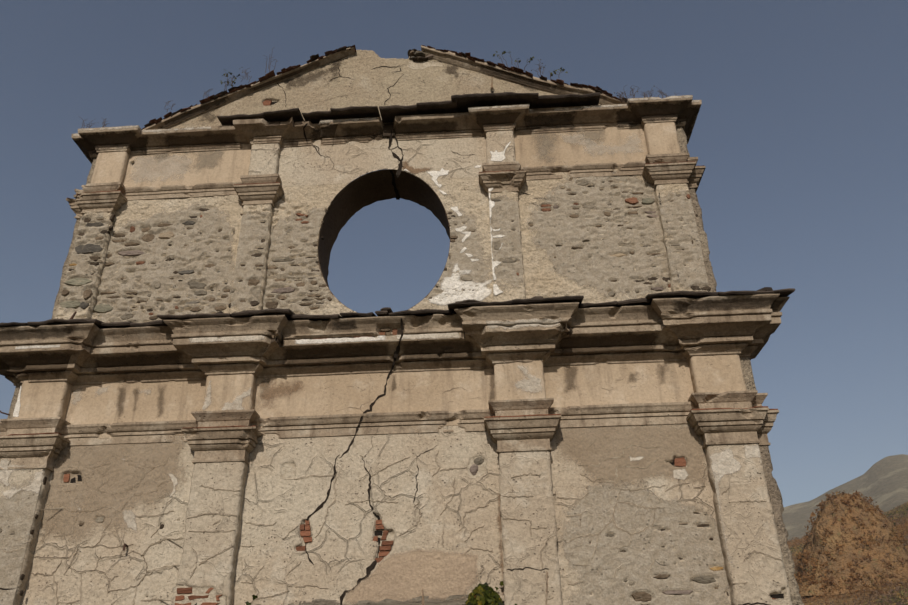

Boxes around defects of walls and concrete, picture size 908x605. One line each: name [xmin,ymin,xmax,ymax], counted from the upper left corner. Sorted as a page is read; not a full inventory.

crack [325,57,404,104]
crack [286,123,404,200]
flaking render [427,176,711,299]
crack [0,318,766,605]
flaking render [674,457,686,467]
spalling [294,519,312,551]
spalling [372,512,395,563]
spalling [171,583,227,605]
crack [726,549,783,605]